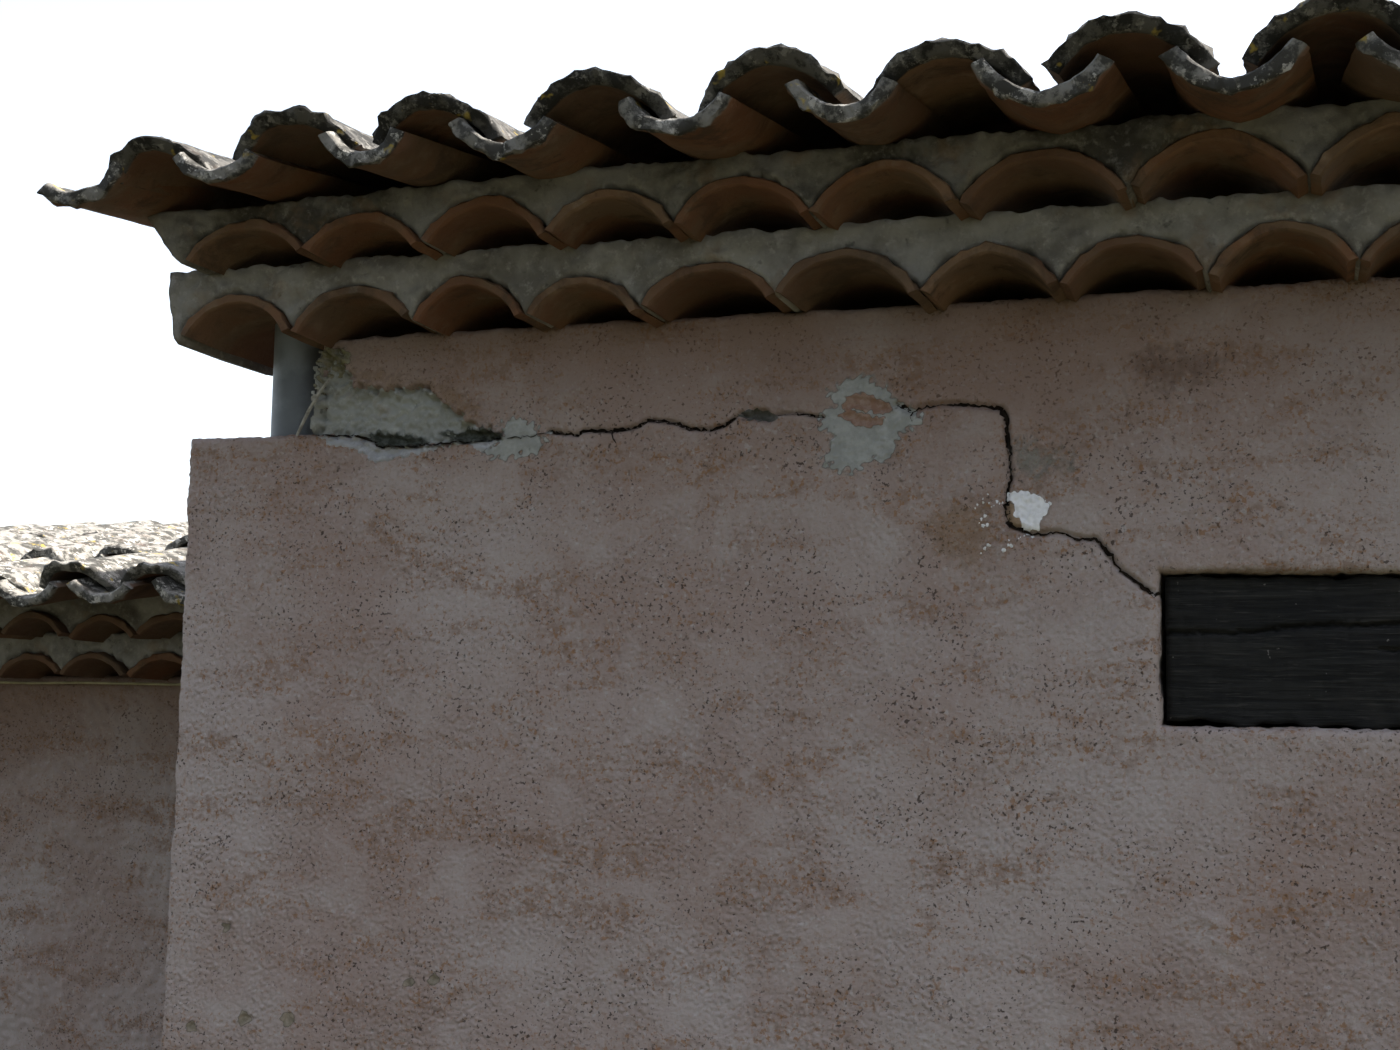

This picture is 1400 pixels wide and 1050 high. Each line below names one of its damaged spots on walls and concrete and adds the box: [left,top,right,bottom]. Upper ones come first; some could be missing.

flaking render [310,347,502,463]
crack [507,418,736,443]
crack [778,411,825,419]
peeling [974,490,1052,554]
crack [897,403,1161,598]